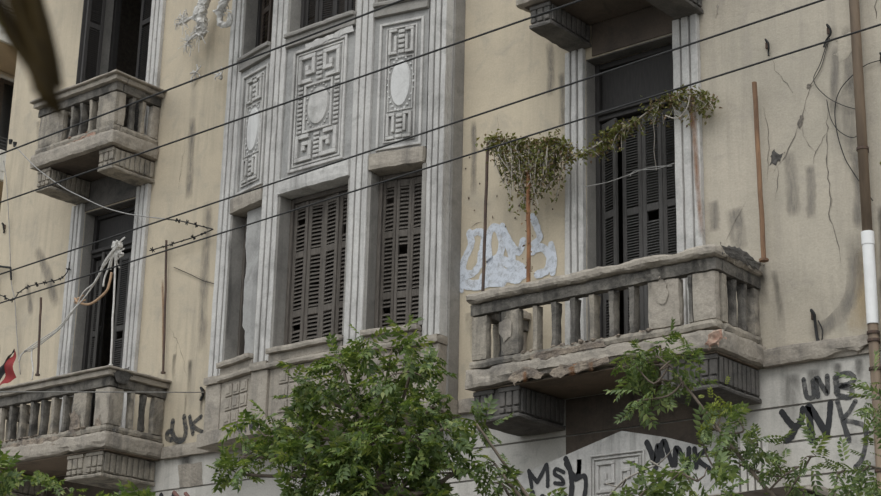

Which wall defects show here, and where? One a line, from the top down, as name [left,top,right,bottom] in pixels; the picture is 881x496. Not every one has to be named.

crack [764,71,841,261]
spalling [704,329,727,350]
spalling [507,340,609,386]